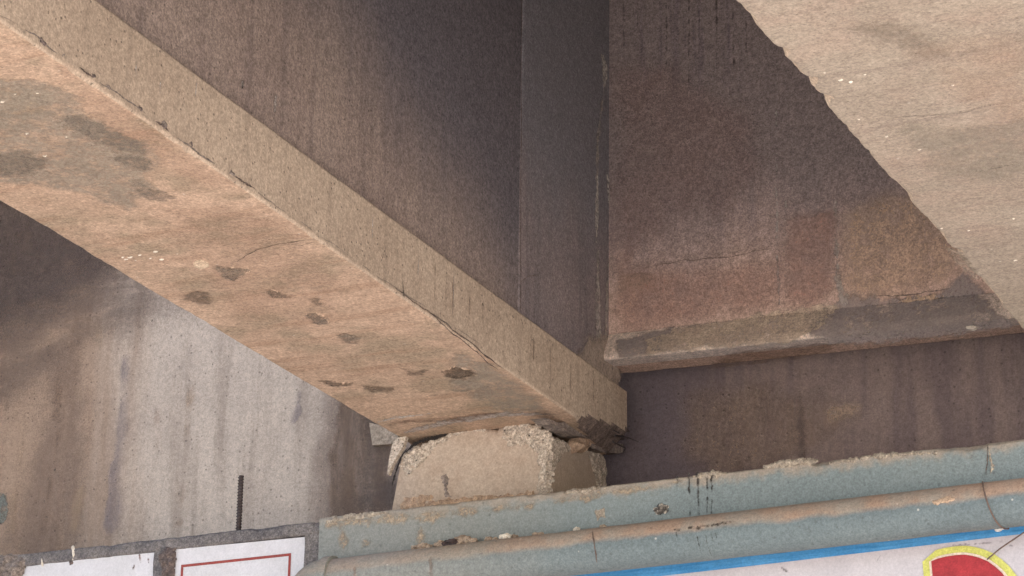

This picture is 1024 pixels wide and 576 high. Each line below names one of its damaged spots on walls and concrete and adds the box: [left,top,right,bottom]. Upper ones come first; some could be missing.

damp [0,80,150,207]
damp [578,55,1024,385]
spalling [387,418,639,509]